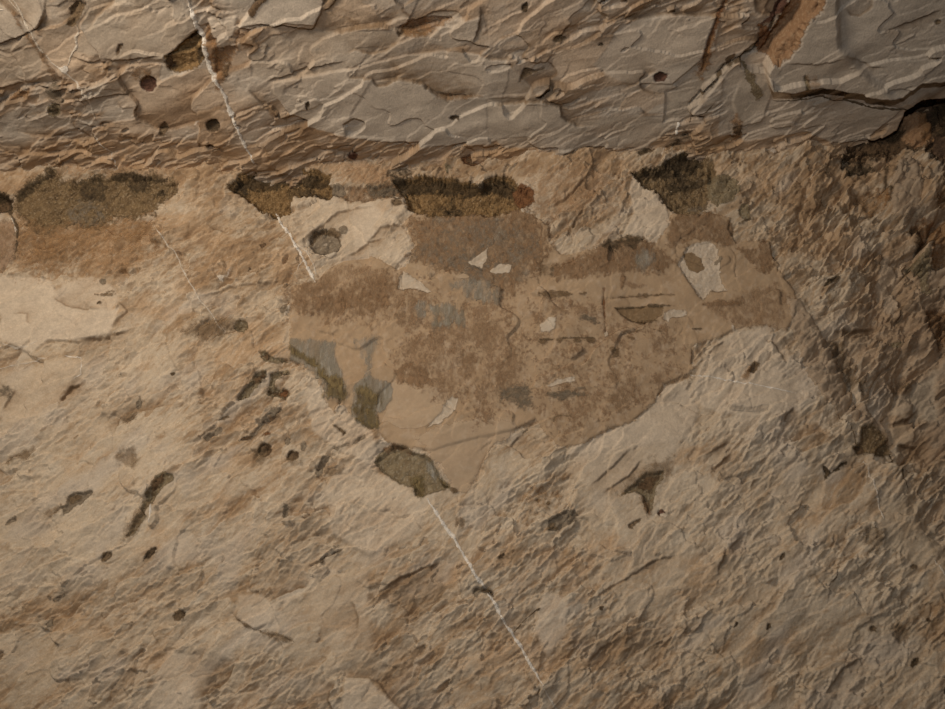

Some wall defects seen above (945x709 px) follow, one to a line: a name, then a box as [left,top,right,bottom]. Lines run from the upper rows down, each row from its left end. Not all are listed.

leakage [405,175,774,302]
leakage [289,338,393,428]
leakage [410,463,438,497]
crack [237,619,294,642]